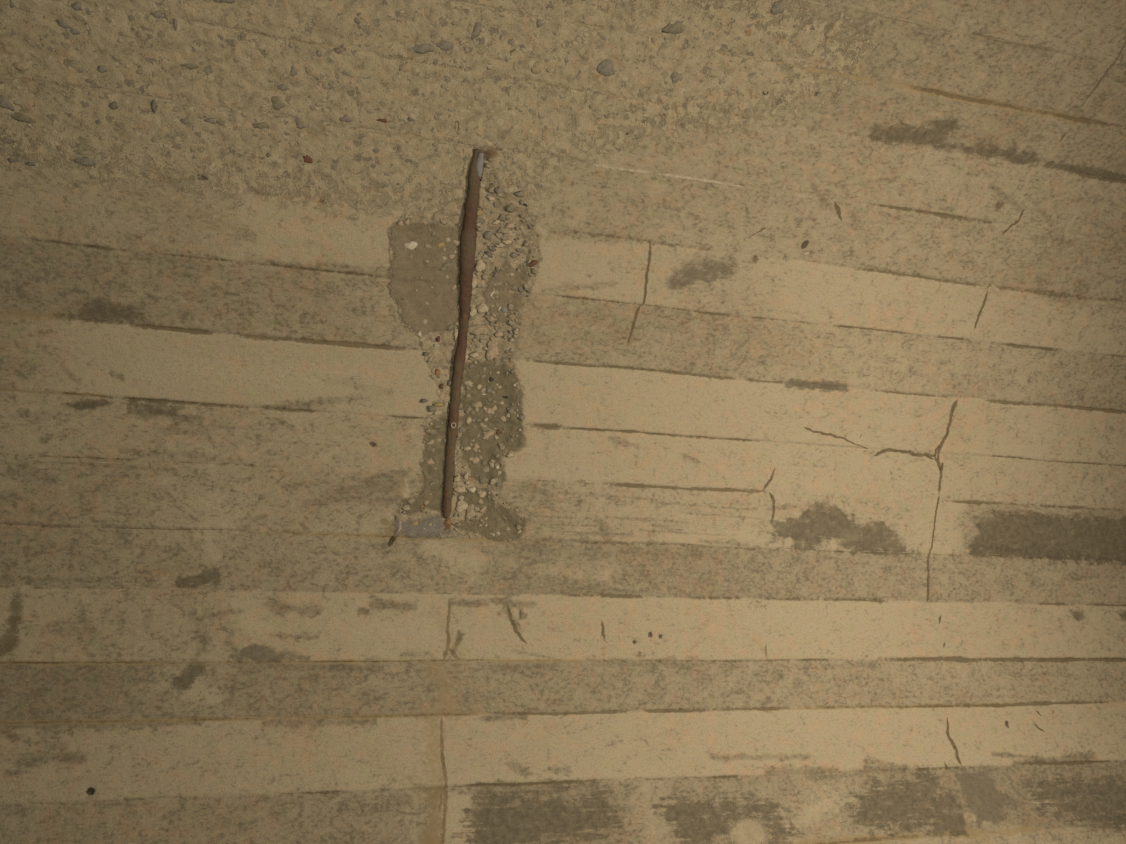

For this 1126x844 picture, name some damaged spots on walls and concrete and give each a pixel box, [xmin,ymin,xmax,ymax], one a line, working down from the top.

crack [623,242,652,344]
spalling [388,146,543,542]
crack [762,469,775,521]
damp [770,503,914,556]
crack [804,400,958,647]
damp [970,510,1126,565]
crack [944,718,962,769]
damp [461,787,622,844]
damp [653,792,800,844]
damp [846,768,1012,836]
damp [1023,771,1126,828]